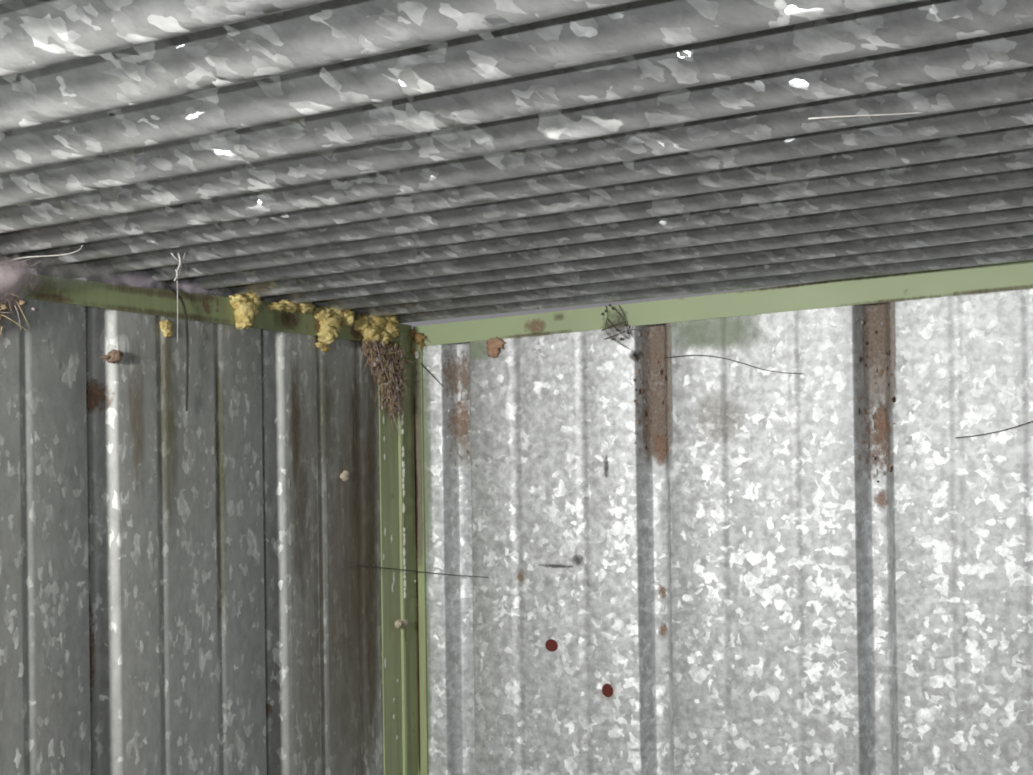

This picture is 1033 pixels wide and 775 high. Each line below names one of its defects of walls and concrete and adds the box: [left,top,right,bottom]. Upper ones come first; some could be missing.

rust [86,379,108,411]
rust [442,352,470,465]
rust [633,323,673,463]
rust [857,298,915,506]